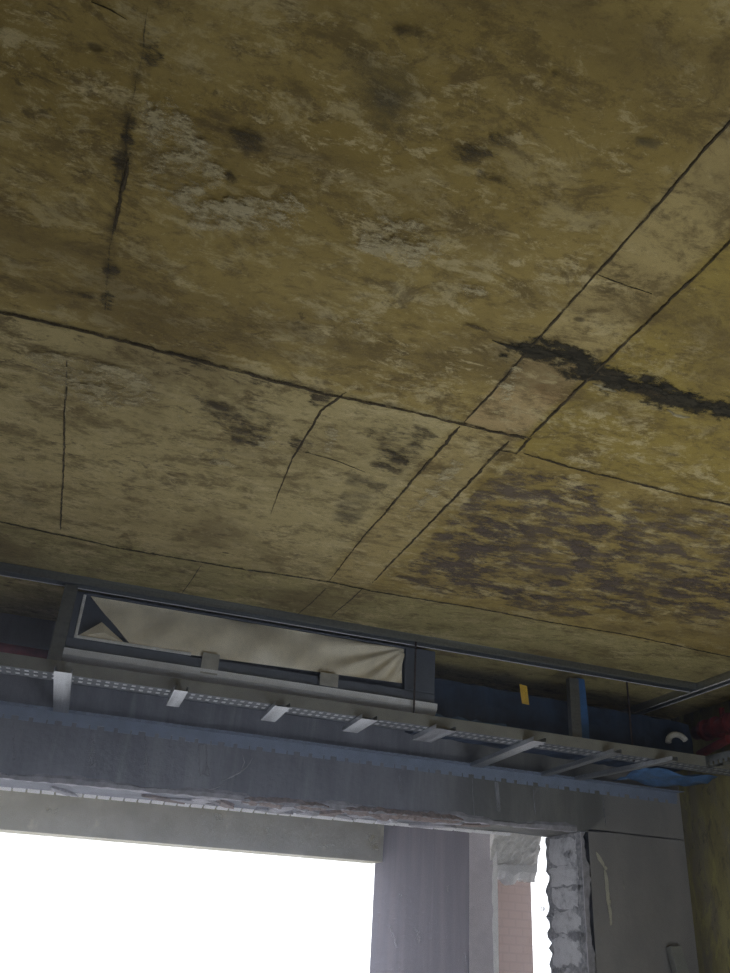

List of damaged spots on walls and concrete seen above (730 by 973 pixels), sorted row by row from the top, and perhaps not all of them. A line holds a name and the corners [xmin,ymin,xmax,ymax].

crack [91,1,163,67]
crack [0,120,730,657]
water stain [398,470,730,628]